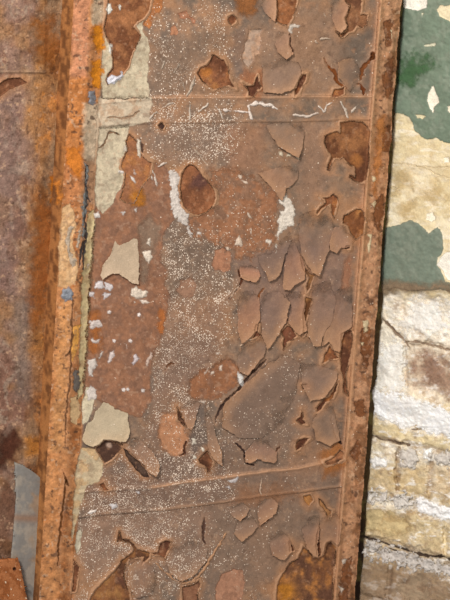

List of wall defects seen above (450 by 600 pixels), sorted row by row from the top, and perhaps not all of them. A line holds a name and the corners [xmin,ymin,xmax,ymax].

peeling [394,0,450,143]
rust [66,147,83,177]
rust [30,176,63,322]
peeling [381,212,450,290]
peeling [58,0,372,600]
crack [215,359,267,421]
rust [0,429,21,465]